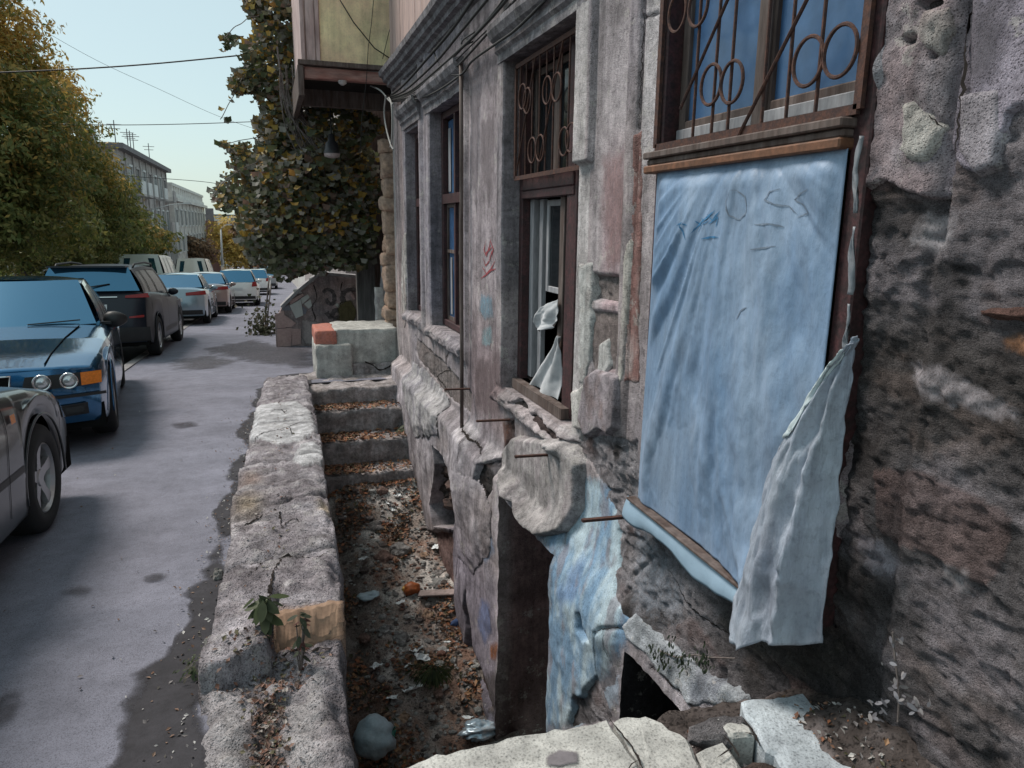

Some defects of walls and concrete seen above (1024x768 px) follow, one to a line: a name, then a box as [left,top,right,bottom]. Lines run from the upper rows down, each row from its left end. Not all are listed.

crack [928,5,973,149]
spalling [416,339,472,412]
spalling [479,90,1024,768]
crack [250,553,327,600]
spalling [435,531,454,583]
crack [609,718,643,768]